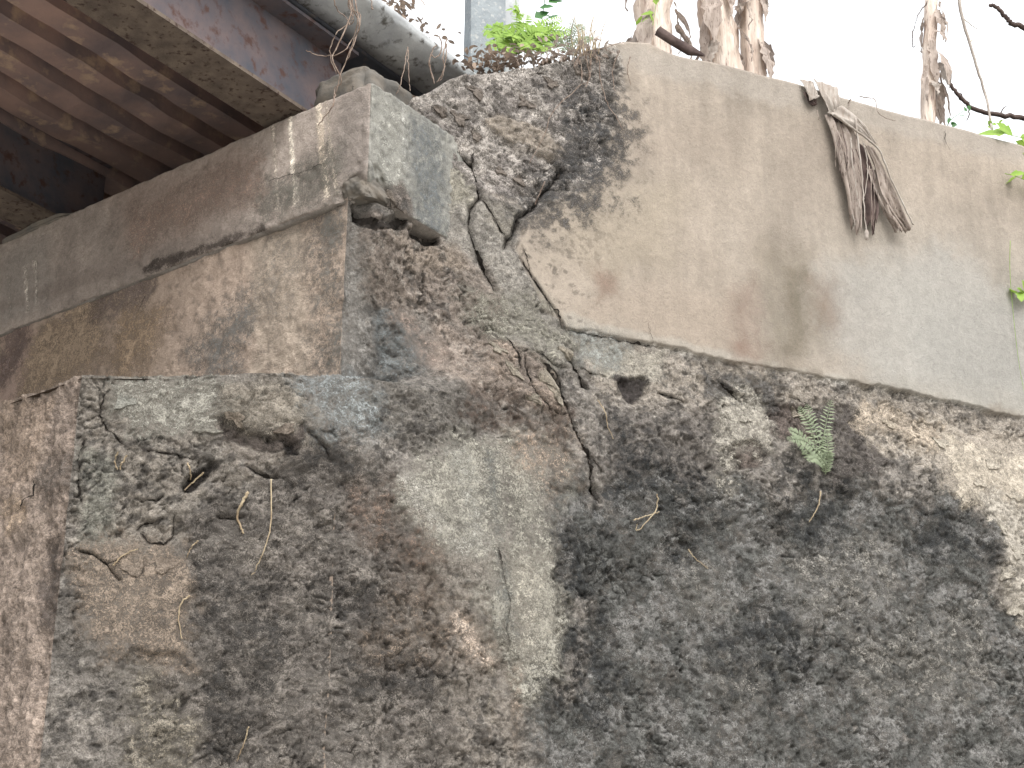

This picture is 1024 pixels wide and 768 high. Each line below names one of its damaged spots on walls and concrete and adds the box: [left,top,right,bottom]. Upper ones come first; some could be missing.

water stain [184,90,446,442]
spalling [342,175,412,215]
crack [457,151,662,348]
water stain [505,81,646,230]
crack [77,394,197,501]
crack [489,326,605,502]
water stain [701,369,779,414]
crack [80,496,175,579]
spalling [527,384,1024,768]